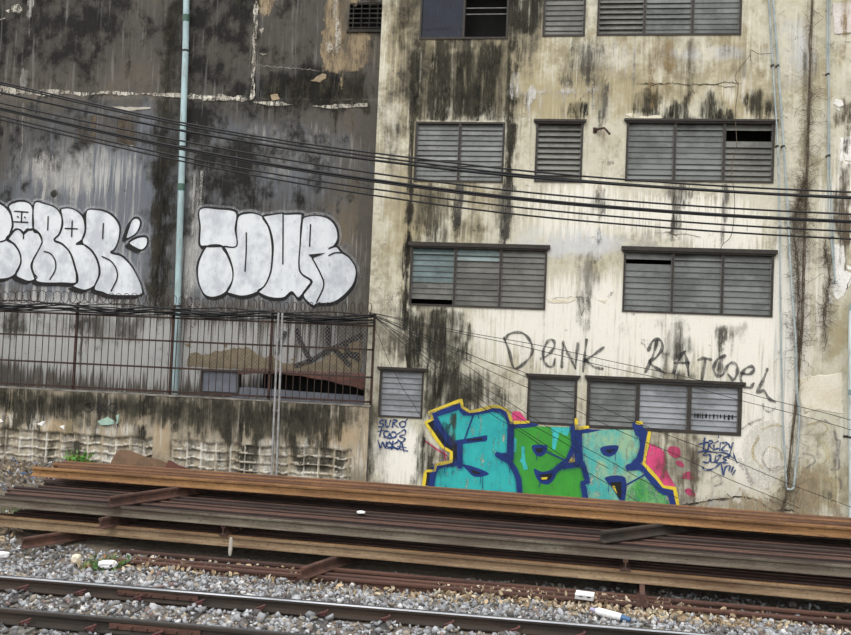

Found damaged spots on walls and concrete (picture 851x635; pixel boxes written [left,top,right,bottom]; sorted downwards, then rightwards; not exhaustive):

peeling [832,3,851,34]
flaking render [310,0,373,87]
crack [639,81,742,94]
leakage [633,88,691,119]
leakage [701,93,734,119]
leakage [744,90,775,119]
leakage [143,0,182,311]
peeling [840,136,851,165]
leakage [402,40,537,483]
leakage [0,383,129,450]
leakage [139,391,346,470]